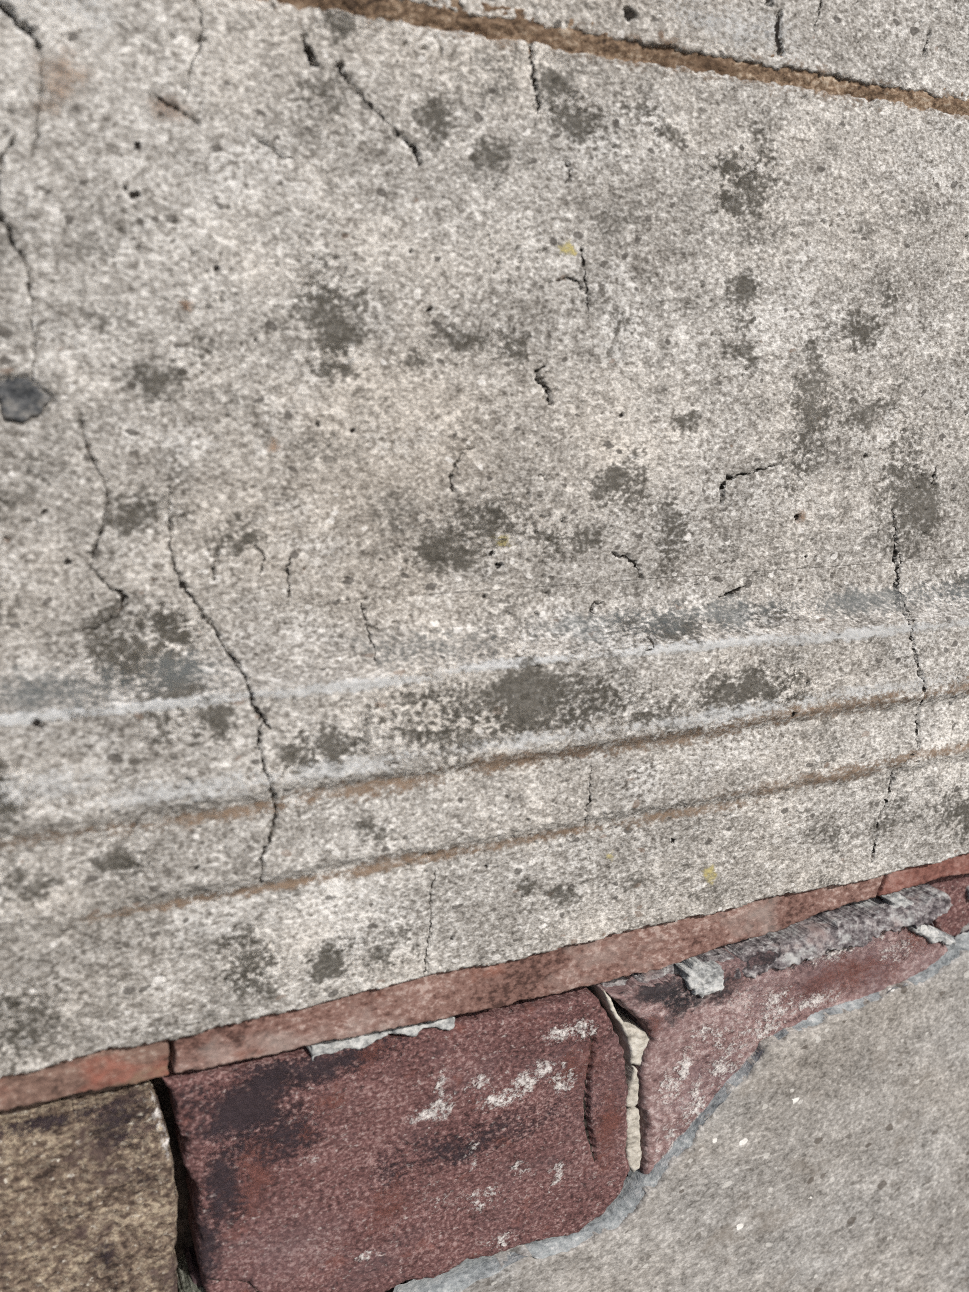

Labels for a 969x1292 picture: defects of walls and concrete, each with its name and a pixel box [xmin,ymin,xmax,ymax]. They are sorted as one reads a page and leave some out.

crack [0,2,43,172]
crack [0,216,37,380]
crack [65,415,125,634]
crack [255,543,291,602]
crack [168,484,277,884]
crack [871,509,926,862]
spalling [773,932,969,1040]
spalling [393,1050,764,1292]